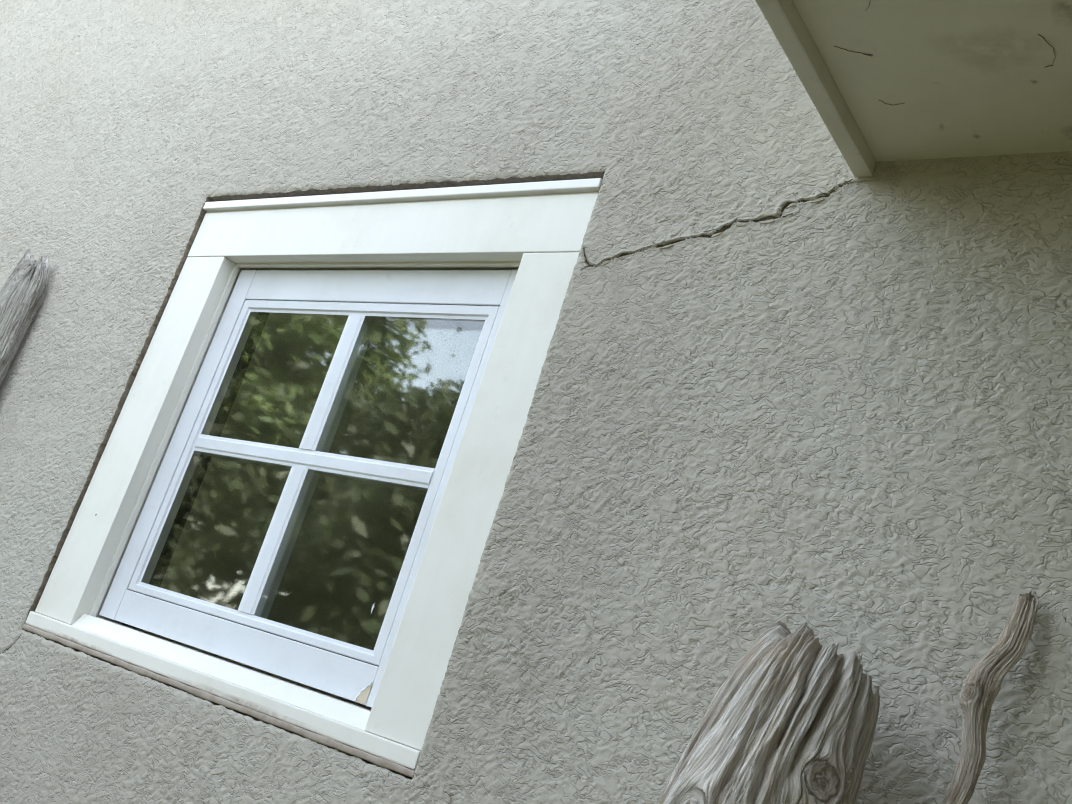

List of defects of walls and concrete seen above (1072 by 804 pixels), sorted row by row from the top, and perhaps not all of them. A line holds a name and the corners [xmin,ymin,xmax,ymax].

crack [581,177,853,270]